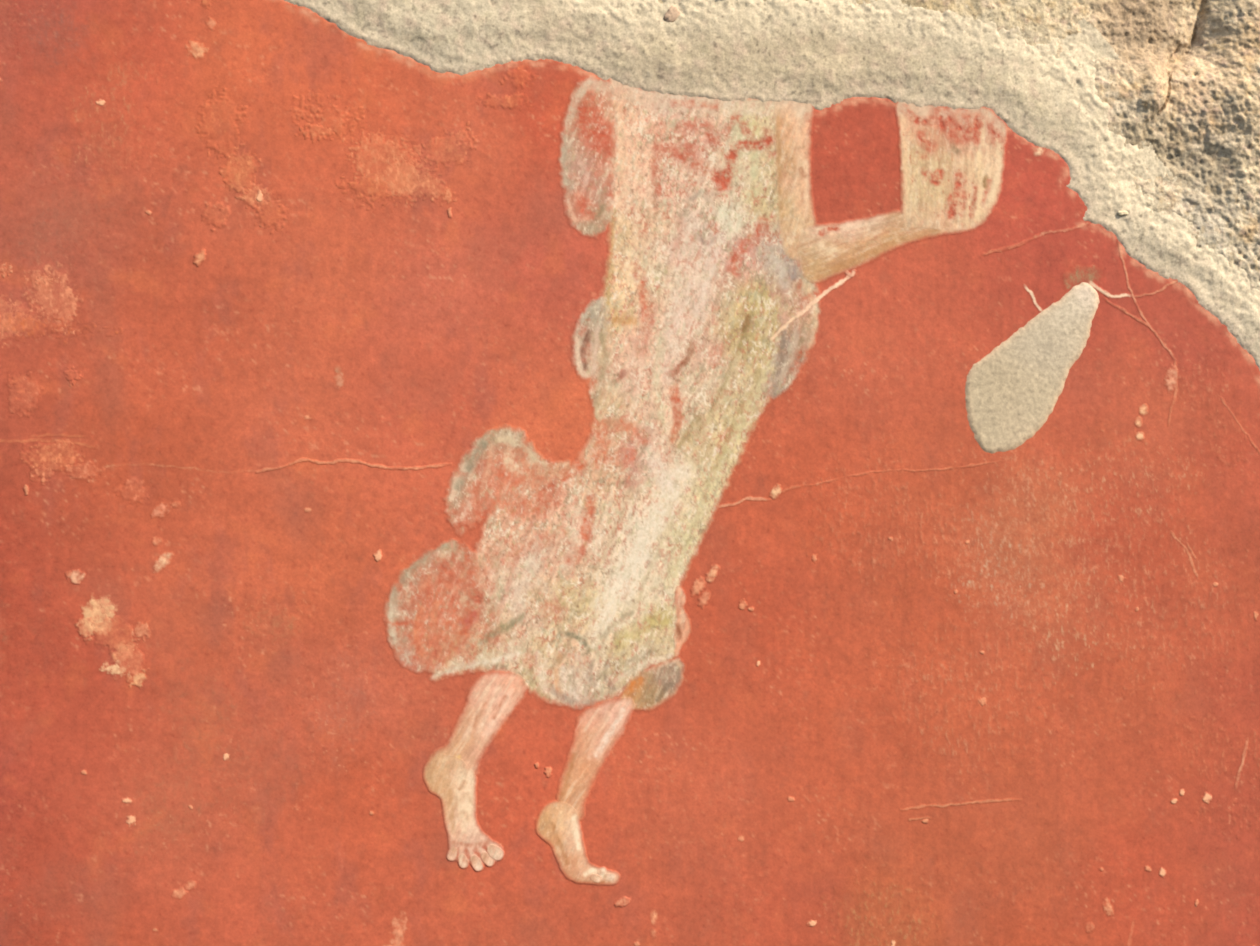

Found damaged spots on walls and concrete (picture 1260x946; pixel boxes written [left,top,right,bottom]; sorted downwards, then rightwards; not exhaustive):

peeling [184,0,217,61]
peeling [285,89,480,219]
crack [980,221,1092,257]
crack [1022,283,1043,313]
crack [1088,239,1179,427]
peeling [1163,362,1181,394]
crack [102,457,453,475]
crack [719,459,1011,509]